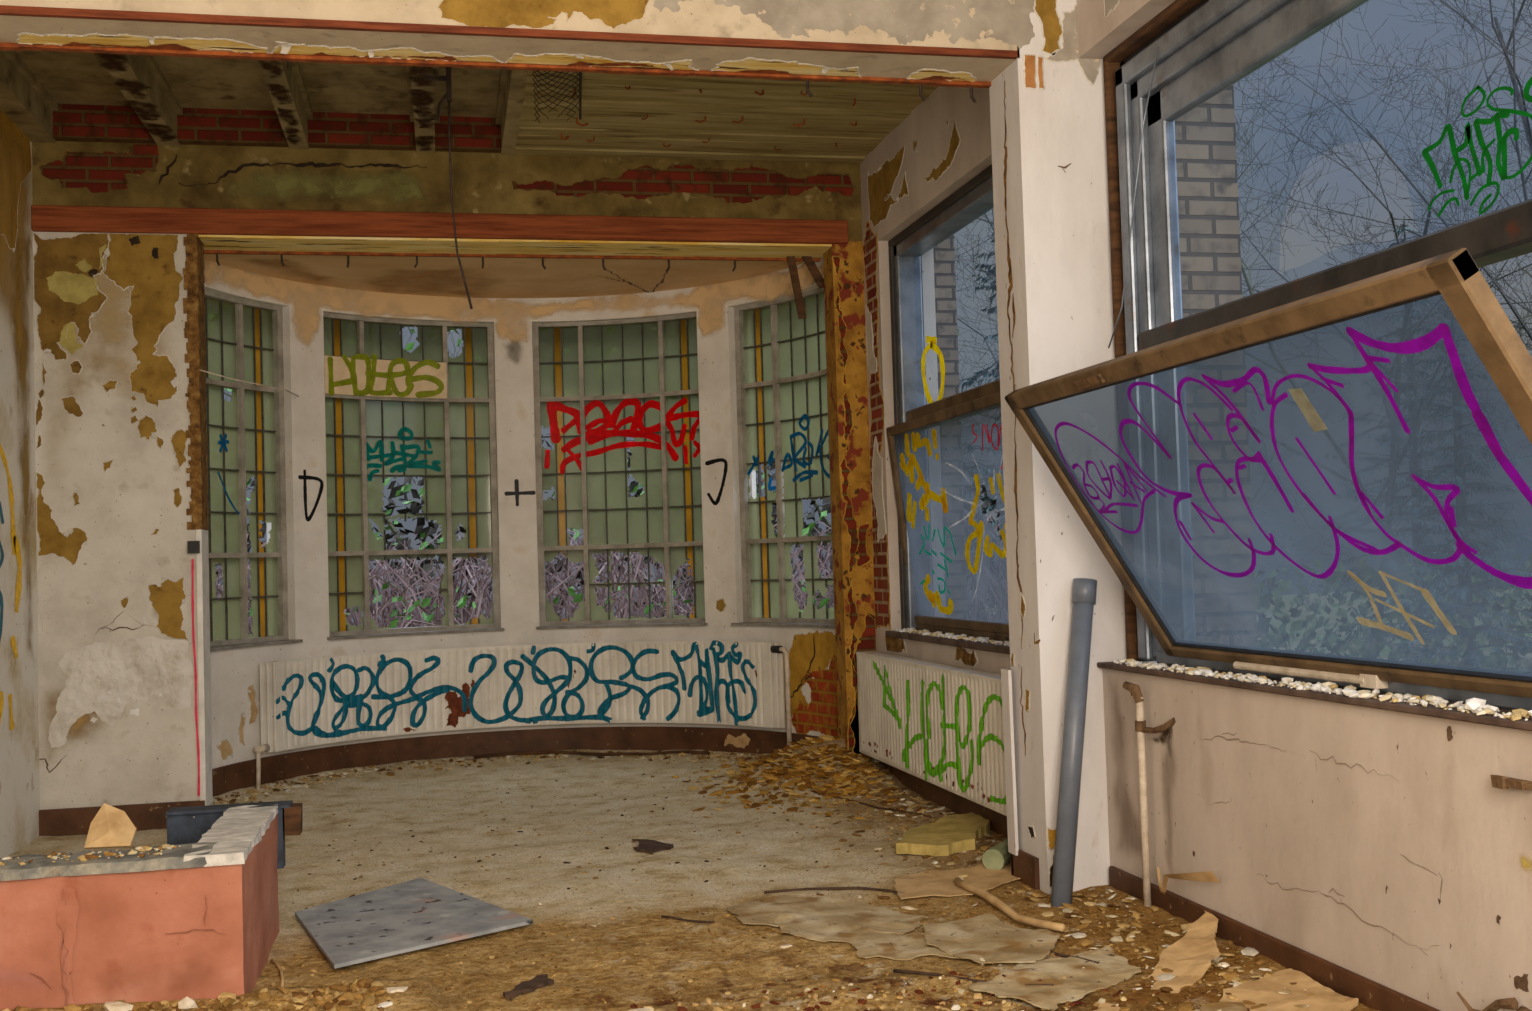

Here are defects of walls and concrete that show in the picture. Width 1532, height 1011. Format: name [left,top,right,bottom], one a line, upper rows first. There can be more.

peeling [15,32,862,77]
peeling [437,0,692,30]
peeling [714,0,1102,90]
spalling [38,143,160,195]
crack [159,154,427,186]
peeling [33,231,188,469]
spalling [511,119,961,758]
peeling [36,471,88,635]
peeling [148,577,189,641]
crack [1201,732,1398,781]
crack [1400,854,1443,899]
crack [1257,873,1439,956]